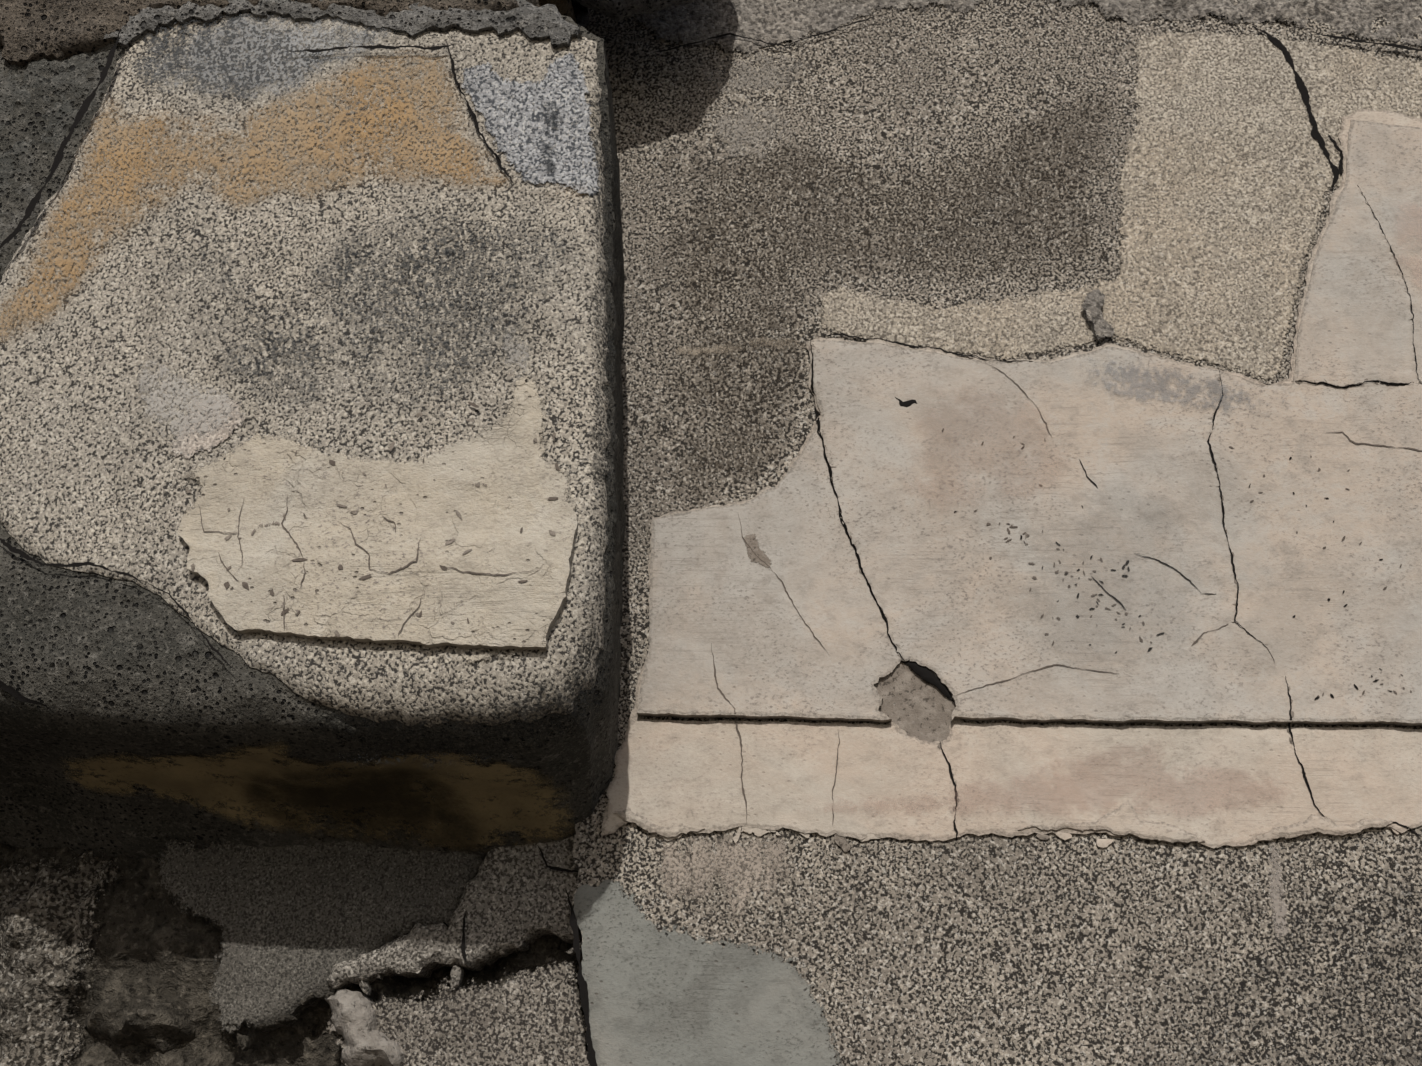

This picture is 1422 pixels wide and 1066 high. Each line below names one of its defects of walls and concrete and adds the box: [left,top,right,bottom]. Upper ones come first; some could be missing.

crack [1253,26,1422,389]
crack [1326,431,1422,451]
crack [809,333,1051,661]
water stain [157,133,616,1040]
crack [1134,369,1327,818]
crack [711,643,747,823]
spalling [874,661,955,742]
peeling [613,808,705,841]
crack [937,742,959,839]
peeling [1020,800,1205,848]
peeling [1247,814,1399,846]
spalling [438,960,464,991]